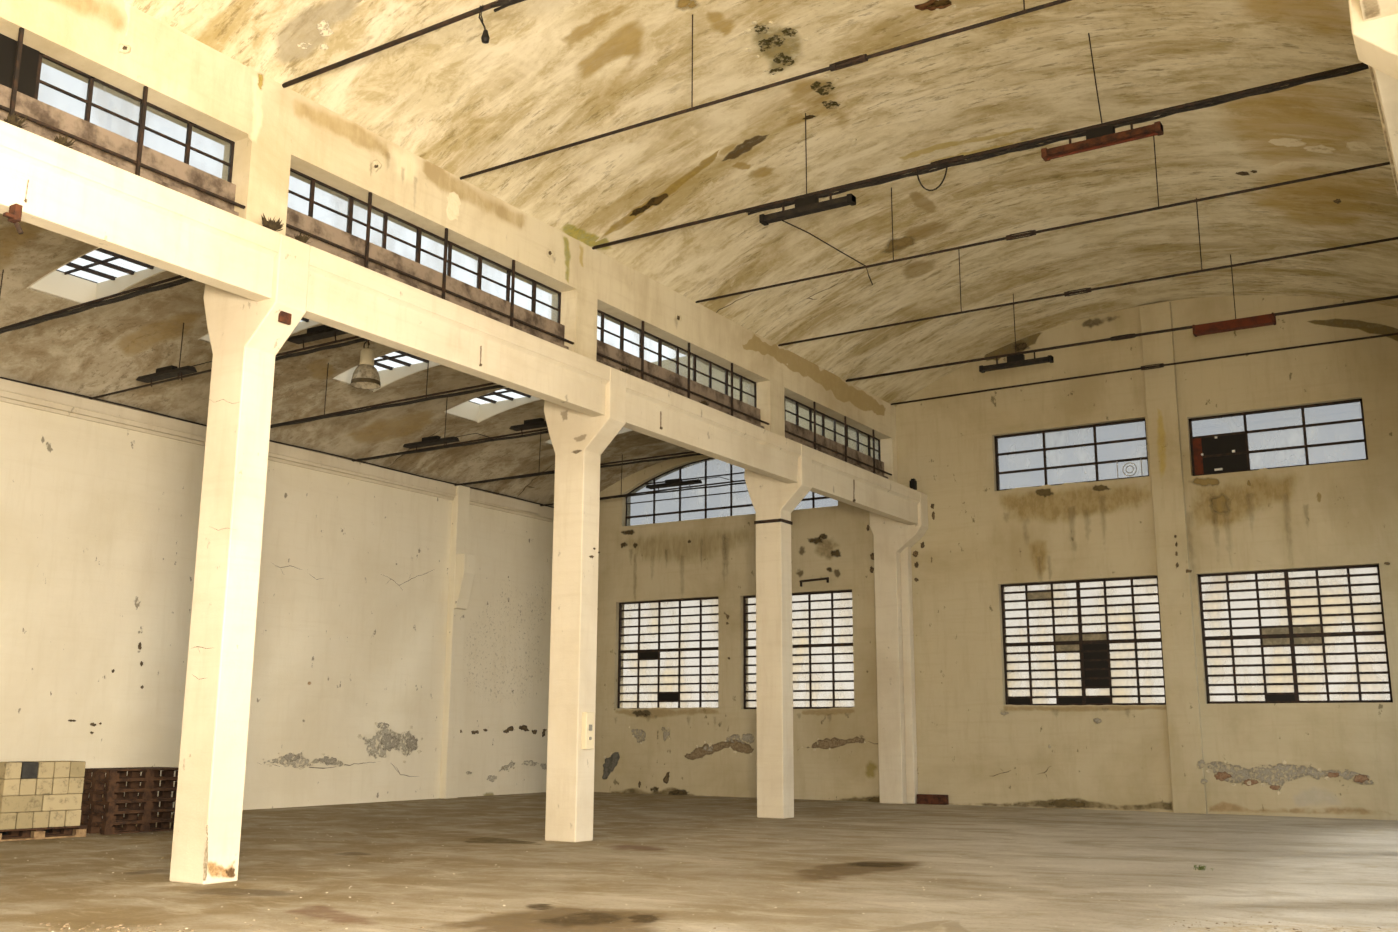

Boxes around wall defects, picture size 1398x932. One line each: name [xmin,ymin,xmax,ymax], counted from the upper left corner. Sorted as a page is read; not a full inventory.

water stain [558,0,857,286]
water stain [996,407,1168,579]
water stain [1186,467,1322,535]
peeling [258,750,346,770]
peeling [354,722,423,763]
flaking render [601,751,620,781]
flaking render [681,734,755,761]
flaking render [801,736,869,751]
flaking render [1196,759,1376,795]